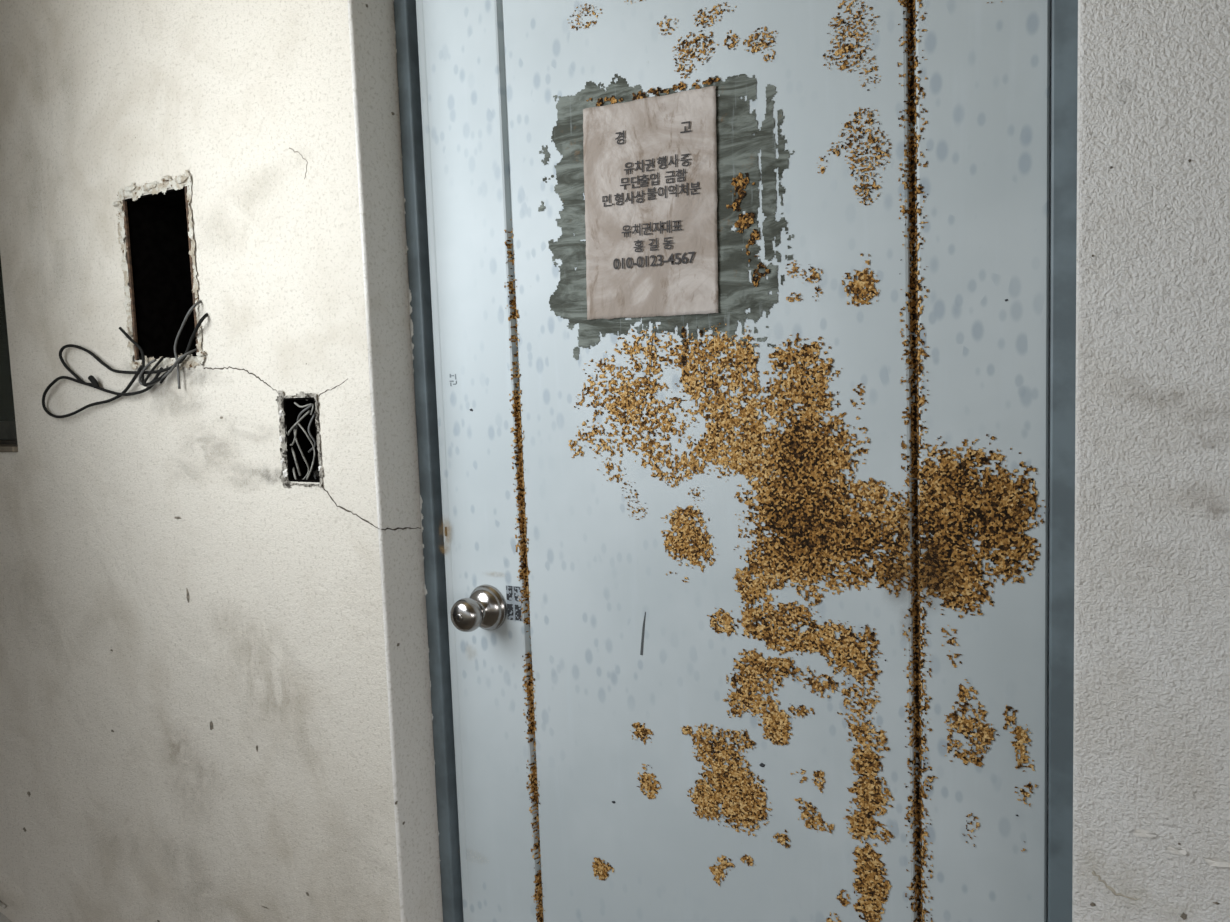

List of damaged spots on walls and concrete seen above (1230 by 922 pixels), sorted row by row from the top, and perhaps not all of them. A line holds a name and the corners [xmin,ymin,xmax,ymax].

crack [203,366,278,393]
crack [322,485,421,530]
rust [504,219,545,922]
rust [569,0,1046,922]